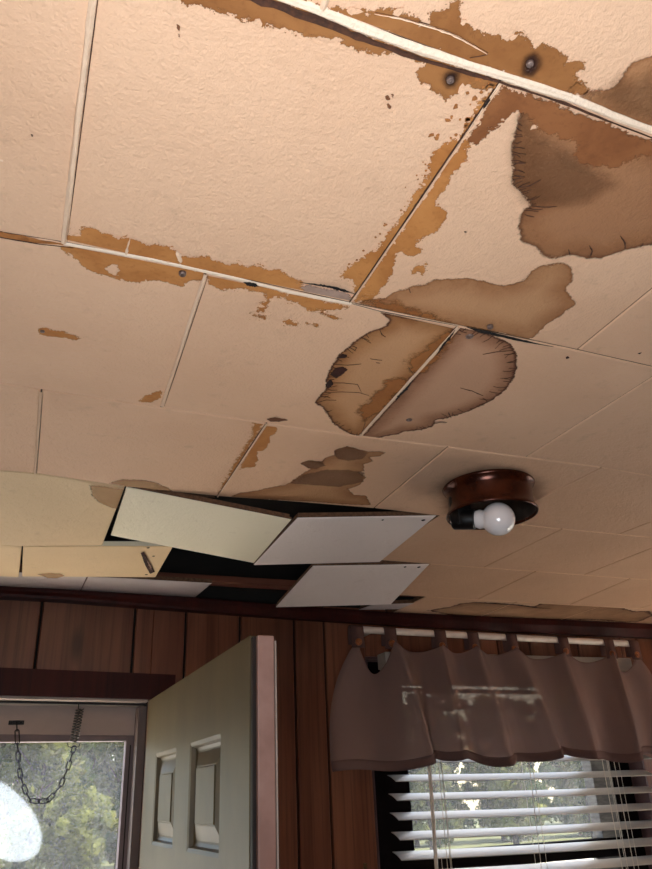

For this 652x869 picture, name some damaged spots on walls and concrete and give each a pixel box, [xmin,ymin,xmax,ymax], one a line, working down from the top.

damp [580,56,652,126]
peeling [61,0,652,327]
damp [315,113,652,438]
peeling [38,328,81,340]
peeling [217,417,287,494]
damp [232,447,384,505]